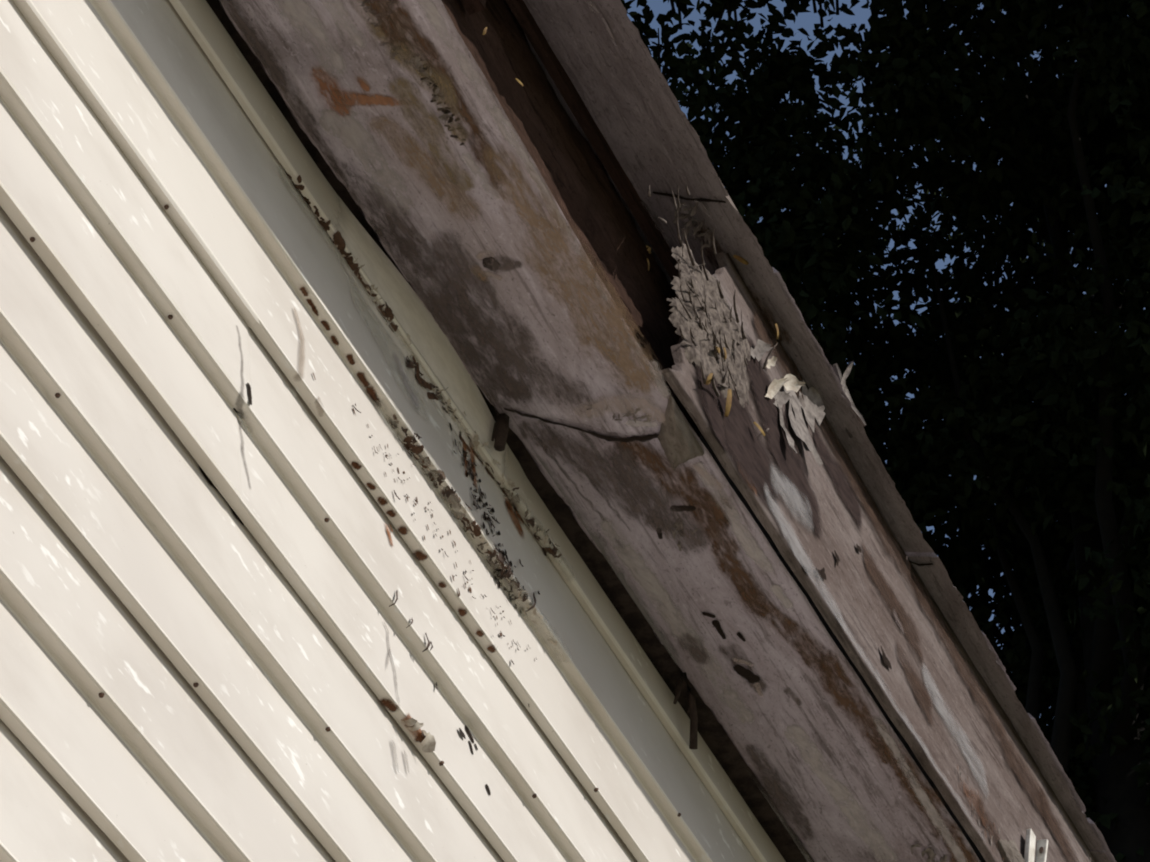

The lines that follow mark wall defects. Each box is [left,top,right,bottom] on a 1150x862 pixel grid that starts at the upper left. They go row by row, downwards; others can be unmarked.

rust [312,68,404,116]
leakage [220,0,657,410]
rust [366,483,408,546]
peeling [285,172,562,665]
rust [506,499,535,537]
crack [503,407,659,543]
peeling [750,339,825,466]
peeling [833,360,866,426]
leakage [519,421,978,862]
leakage [814,415,1079,862]